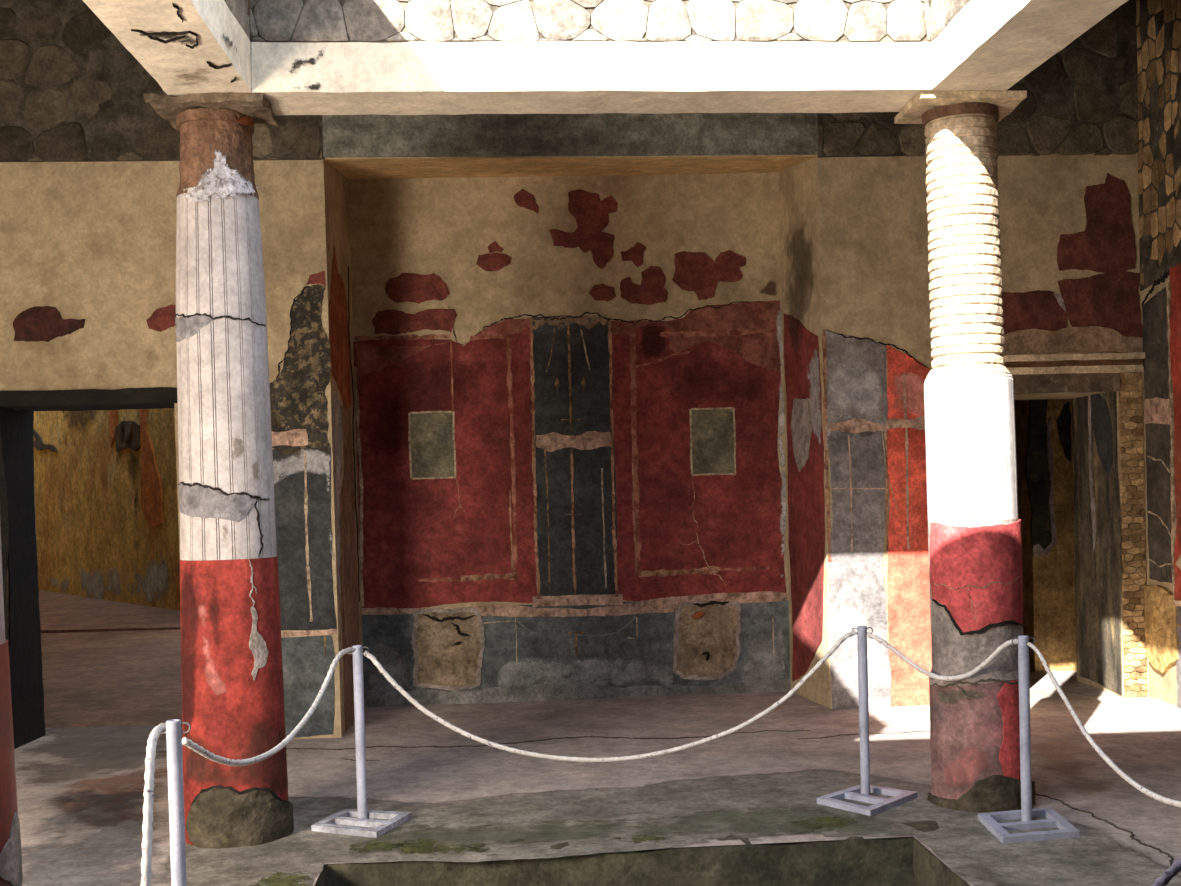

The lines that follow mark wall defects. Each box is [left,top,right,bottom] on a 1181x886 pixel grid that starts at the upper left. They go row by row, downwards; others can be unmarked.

crack [131,4,236,83]
peeling [1002,326,1143,357]
crack [175,266,360,606]
spalling [249,606,269,680]
spalling [0,812,23,886]
spalling [185,785,294,849]